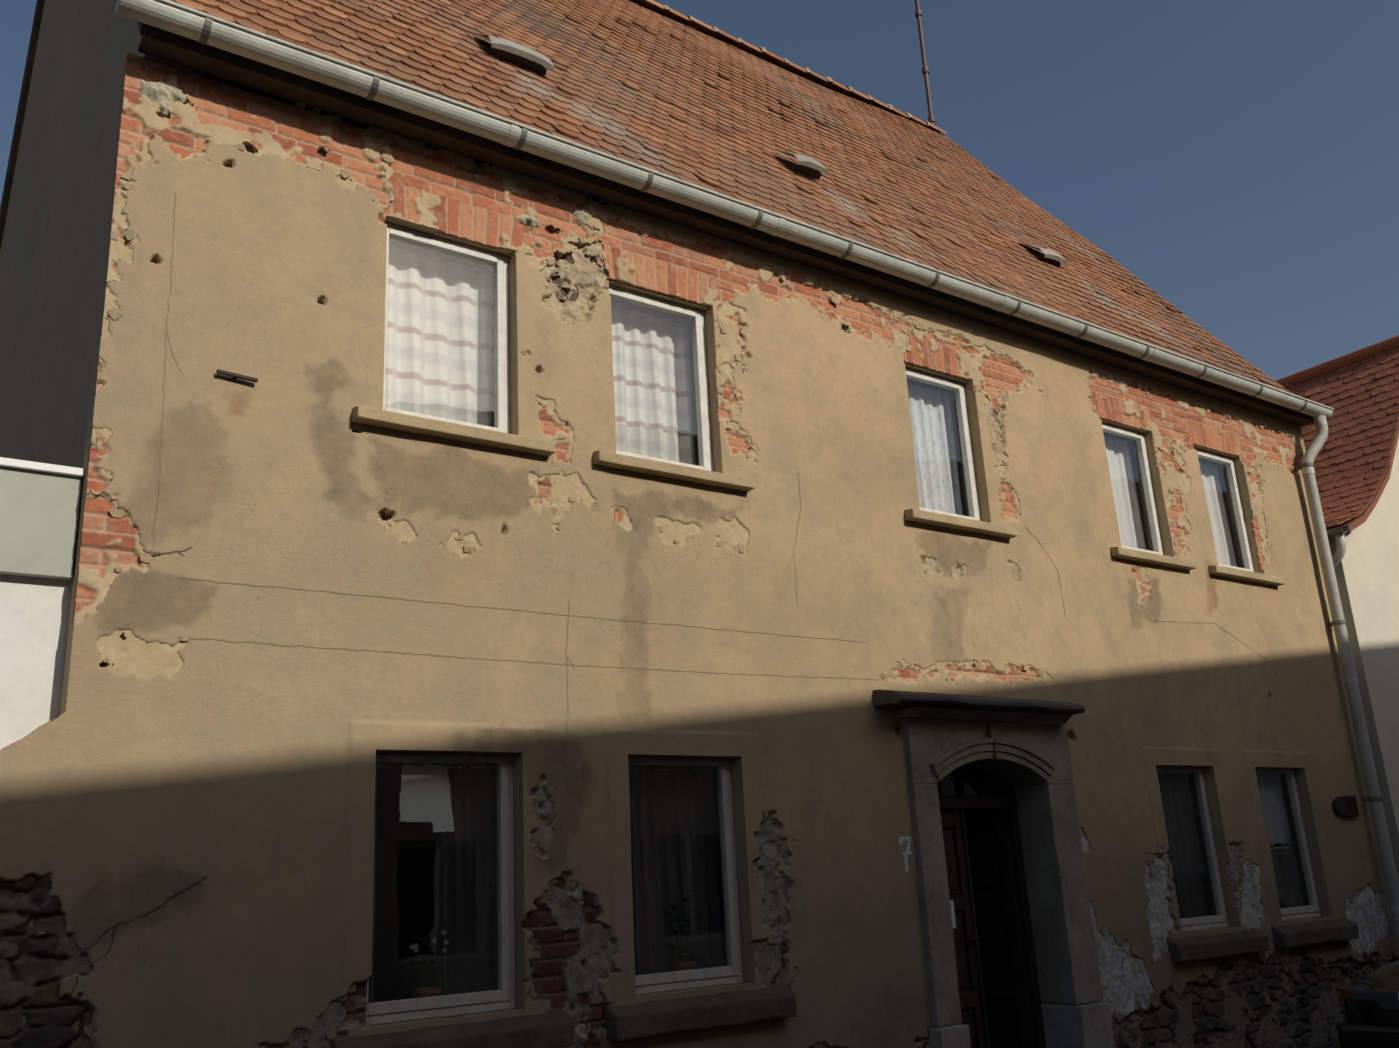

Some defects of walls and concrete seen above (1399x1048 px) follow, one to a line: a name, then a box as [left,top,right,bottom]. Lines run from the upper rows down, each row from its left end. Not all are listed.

flaking render [95,358,105,396]
flaking render [100,54,1041,537]
flaking render [73,428,160,623]
crack [151,193,879,766]
flaking render [1087,370,1302,569]
flaking render [96,630,190,680]
flaking render [0,875,94,1048]
crack [59,876,208,1007]
flaking render [259,980,368,1048]
flaking render [521,872,619,1048]
flaking render [1090,852,1397,1048]